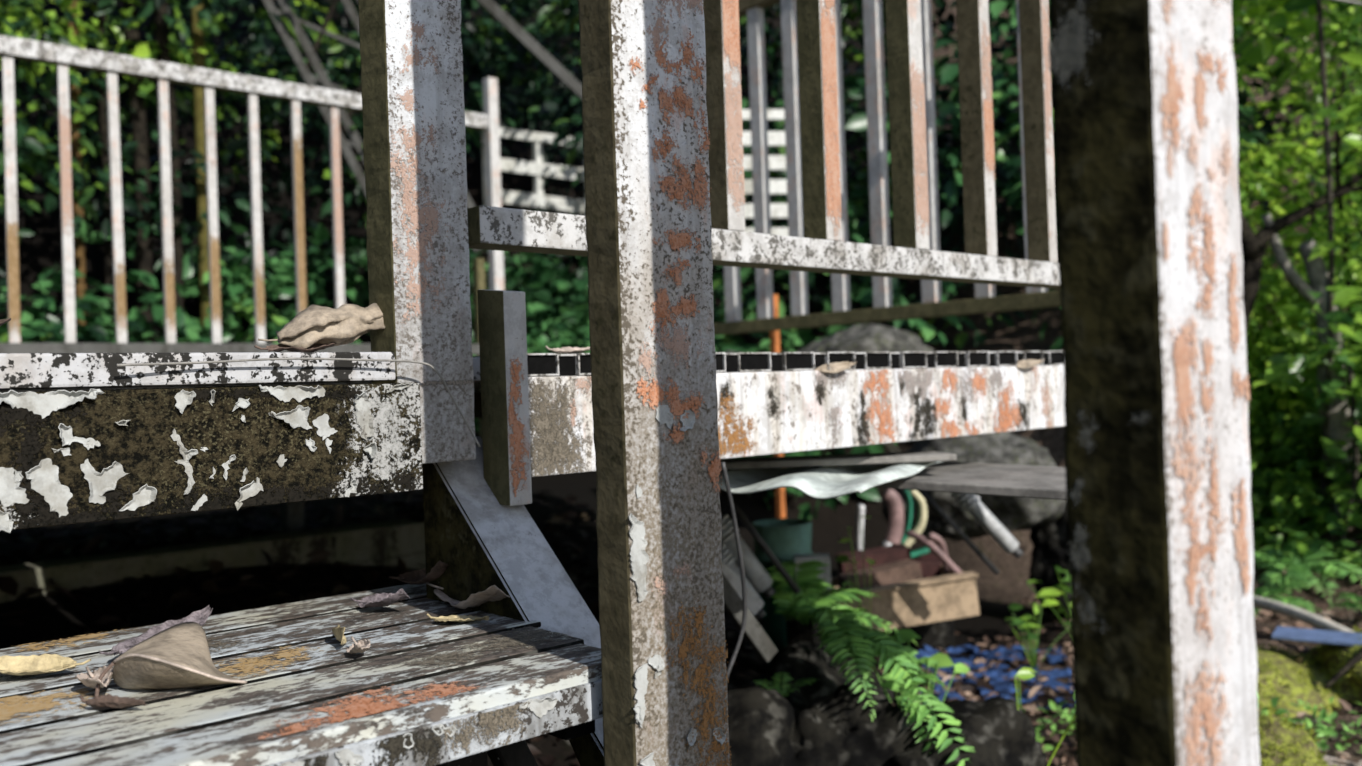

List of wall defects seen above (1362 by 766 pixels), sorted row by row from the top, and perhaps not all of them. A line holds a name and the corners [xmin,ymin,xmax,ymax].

corrosion [629,0,757,492]
peeling [0,389,130,533]
peeling [119,484,157,511]
peeling [174,389,216,414]
peeling [171,428,263,511]
peeling [232,382,423,497]
corrosion [508,358,530,497]
corrosion [861,369,898,444]
corrosion [933,368,1023,438]
corrosion [1160,0,1251,766]
corrosion [259,680,487,740]
peeling [519,697,558,718]